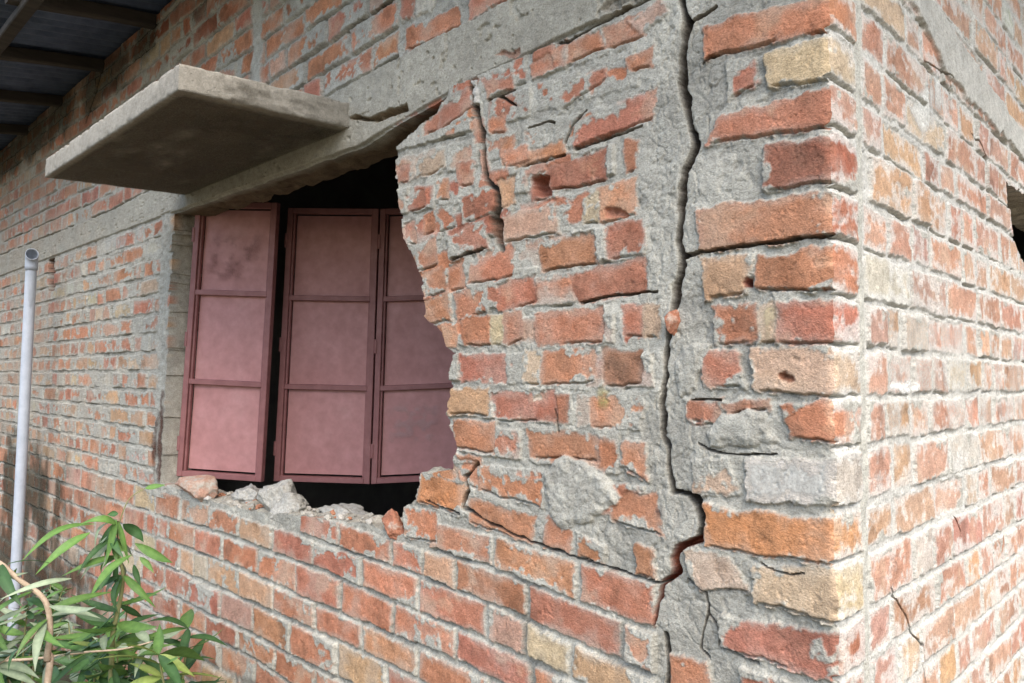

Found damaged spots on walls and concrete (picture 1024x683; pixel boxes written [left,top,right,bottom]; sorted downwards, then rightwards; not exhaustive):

crack [425,0,836,683]
spalling [381,508,404,540]
crack [890,586,927,683]